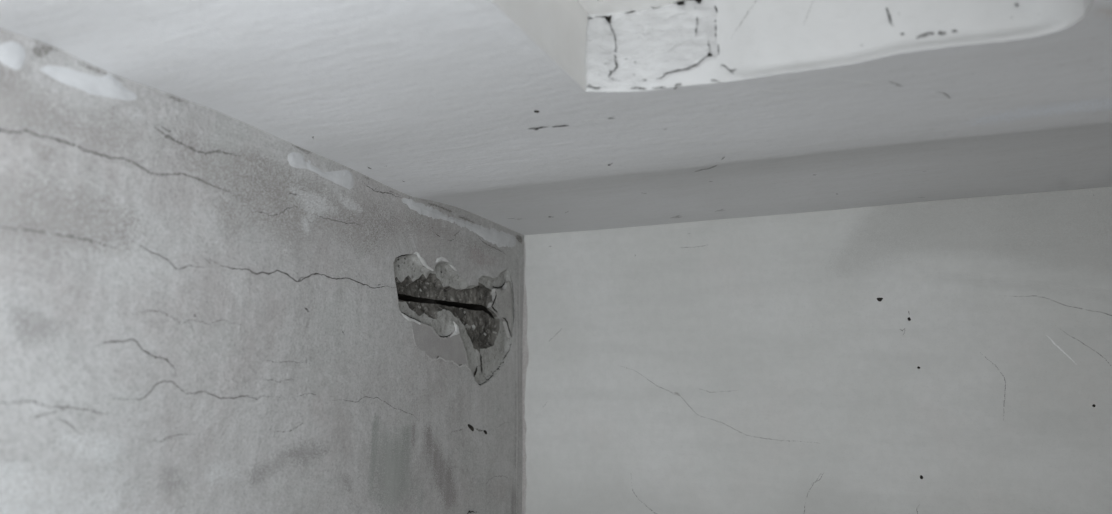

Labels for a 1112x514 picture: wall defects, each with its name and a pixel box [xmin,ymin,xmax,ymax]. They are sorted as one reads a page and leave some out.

crack [0,125,359,225]
crack [0,226,393,288]
crack [0,310,421,435]
flaking render [393,252,514,386]